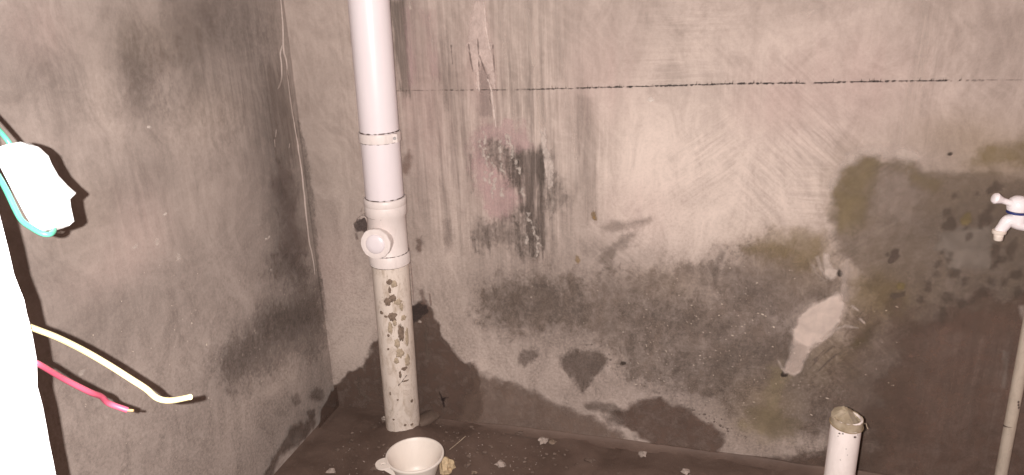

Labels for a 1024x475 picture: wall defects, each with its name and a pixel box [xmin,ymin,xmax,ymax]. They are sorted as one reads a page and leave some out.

damp [512,127,553,256]
damp [265,341,384,475]
damp [413,301,723,452]
damp [773,453,826,467]
peeling [781,293,865,377]
damp [812,149,1024,475]